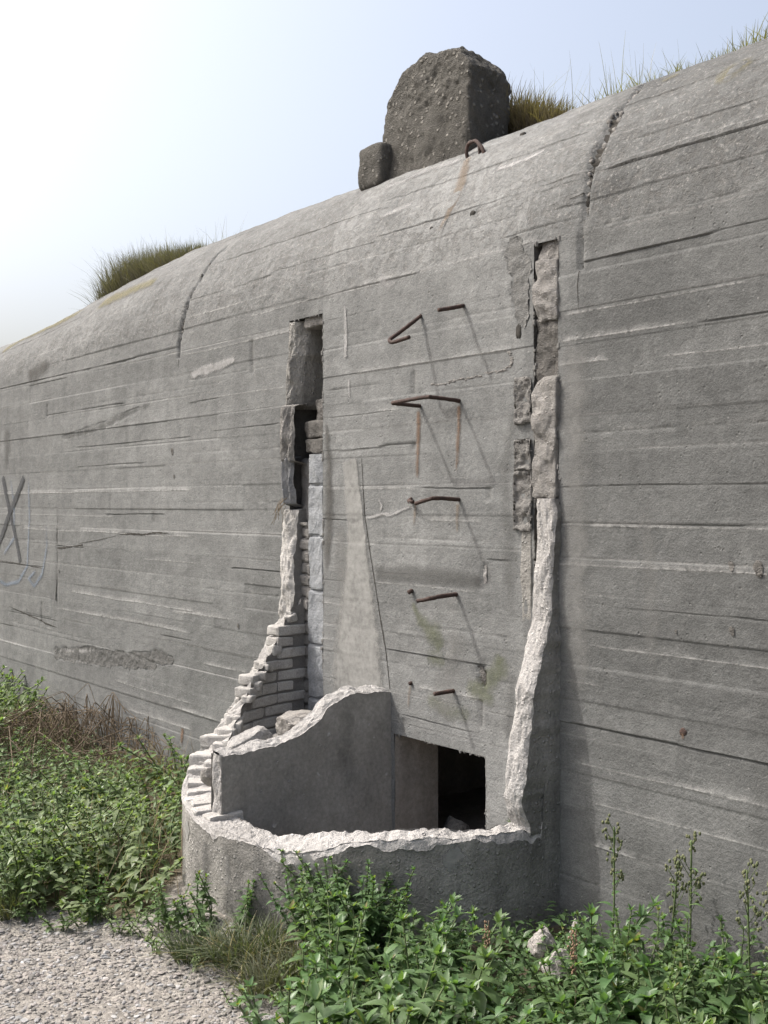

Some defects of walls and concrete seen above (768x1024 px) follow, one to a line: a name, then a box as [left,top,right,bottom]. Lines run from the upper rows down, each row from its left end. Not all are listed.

crack [570,90,641,239]
spalling [504,236,539,328]
spalling [278,510,299,619]
spalling [54,645,174,670]
spalling [503,464,561,836]
spalling [211,685,390,758]